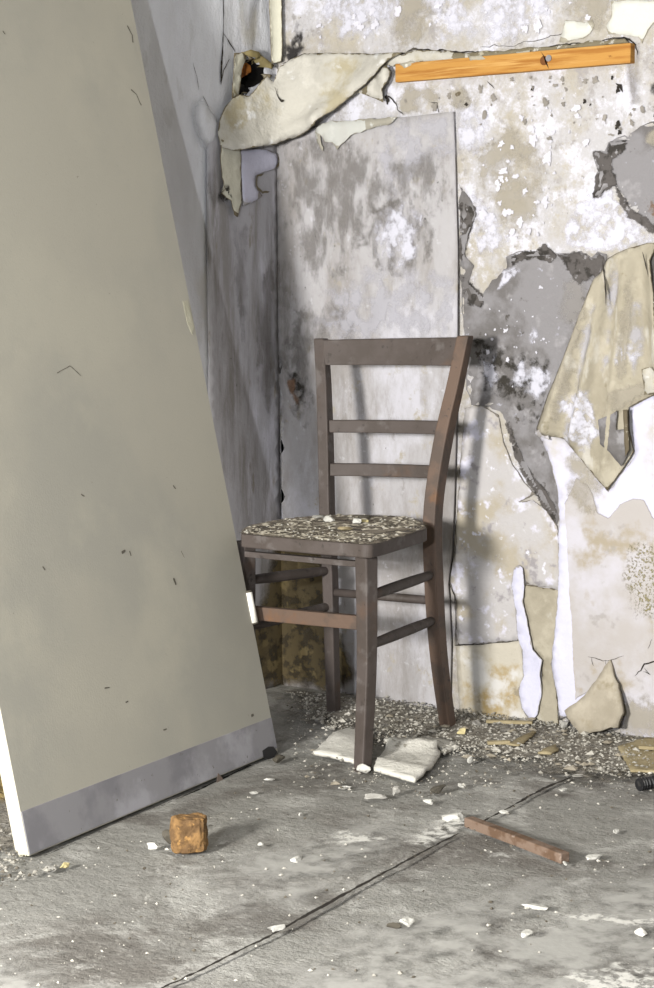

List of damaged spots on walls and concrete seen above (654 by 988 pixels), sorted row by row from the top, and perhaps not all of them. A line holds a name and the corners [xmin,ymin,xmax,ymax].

crack [220,0,235,83]
peeling [384,0,654,68]
spalling [239,60,264,95]
flaking render [431,89,468,111]
flaking render [478,85,497,125]
peeling [549,76,591,133]
peeling [519,115,556,174]
flaking render [582,106,654,233]
damp [369,202,399,234]
flaking render [458,138,607,524]